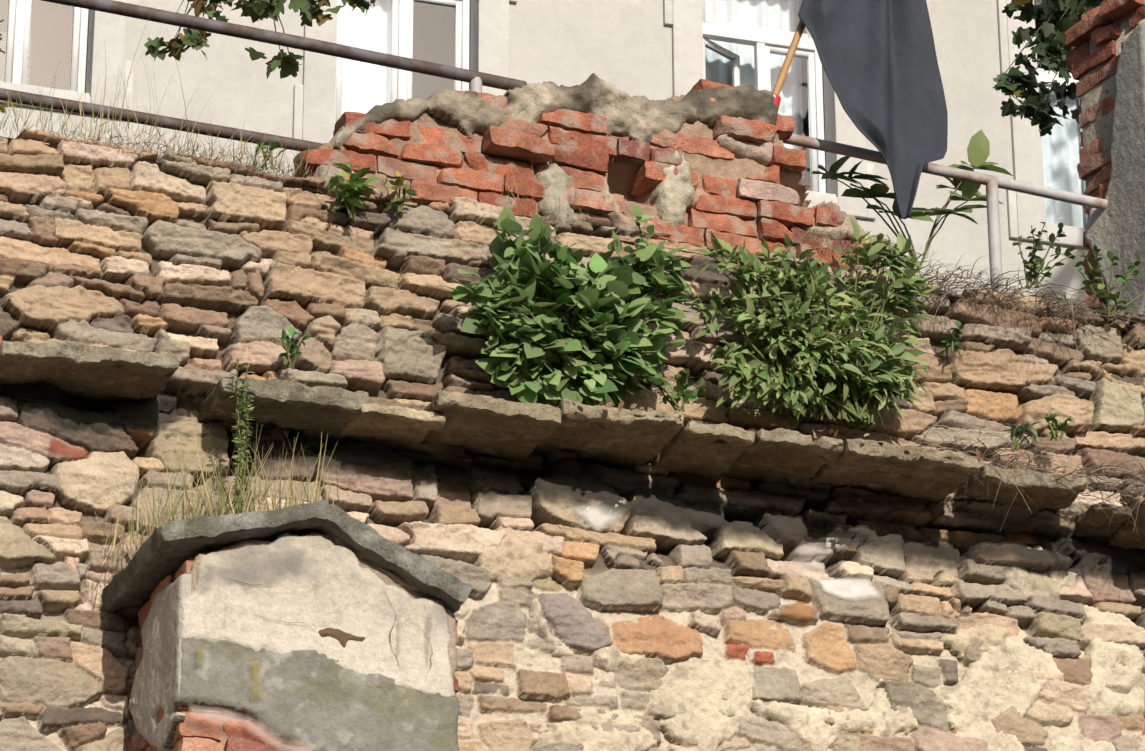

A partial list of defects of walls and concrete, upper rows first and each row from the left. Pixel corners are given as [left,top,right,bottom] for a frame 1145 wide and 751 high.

flaking render [1085,19,1145,315]
leakage [203,711,280,744]
flaking render [128,532,457,751]